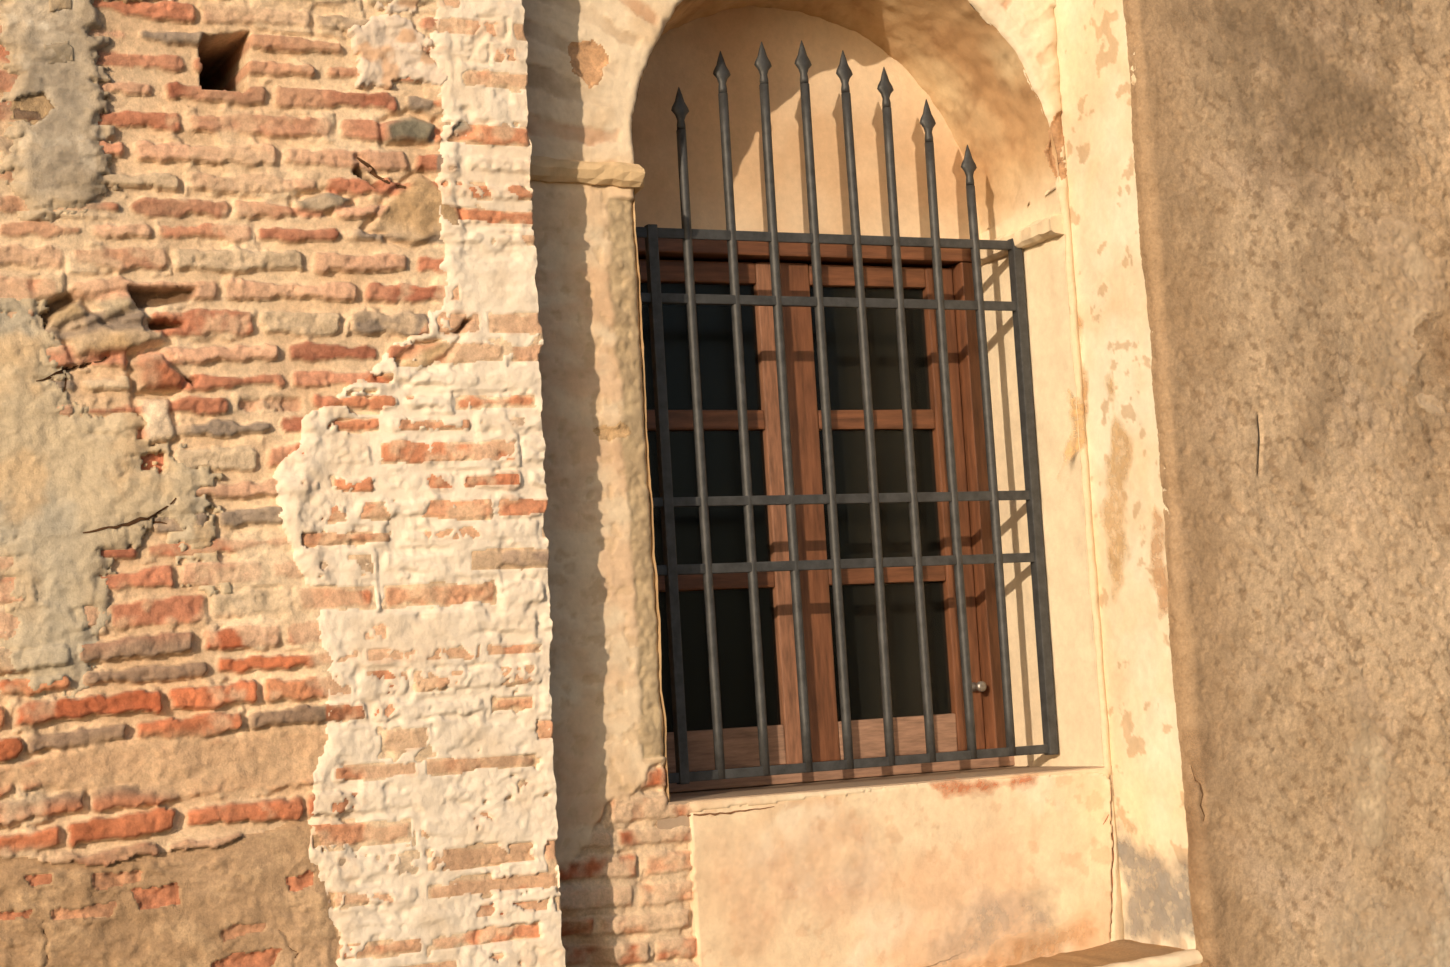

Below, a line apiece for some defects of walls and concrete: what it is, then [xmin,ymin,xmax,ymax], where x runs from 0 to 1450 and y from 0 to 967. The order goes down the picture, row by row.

spalling [49,0,72,12]
spalling [44,41,74,64]
water stain [1223,2,1371,141]
spalling [10,93,55,125]
water stain [1403,306,1426,344]
peeling [272,0,697,967]